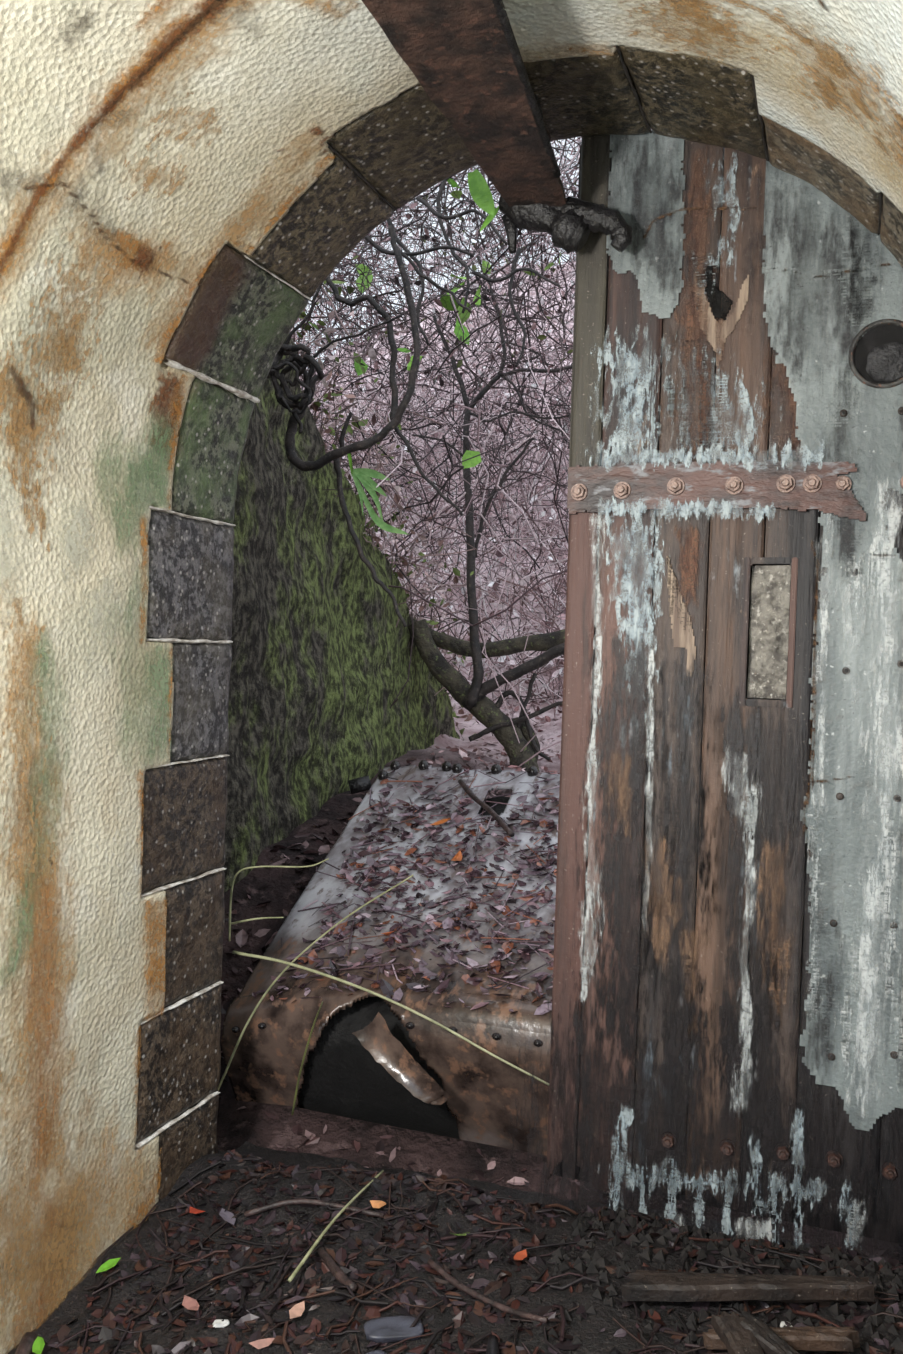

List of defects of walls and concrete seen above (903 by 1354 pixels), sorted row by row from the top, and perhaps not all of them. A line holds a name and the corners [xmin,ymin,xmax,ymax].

rust [0,0,252,276]
peeling [624,0,903,170]
rust [83,228,178,288]
peeling [691,161,740,310]
rust [139,518,148,644]
peeling [589,329,764,472]
peeling [749,502,770,523]
peeling [772,441,824,469]
rust [0,599,161,1350]
rust [135,900,167,1093]